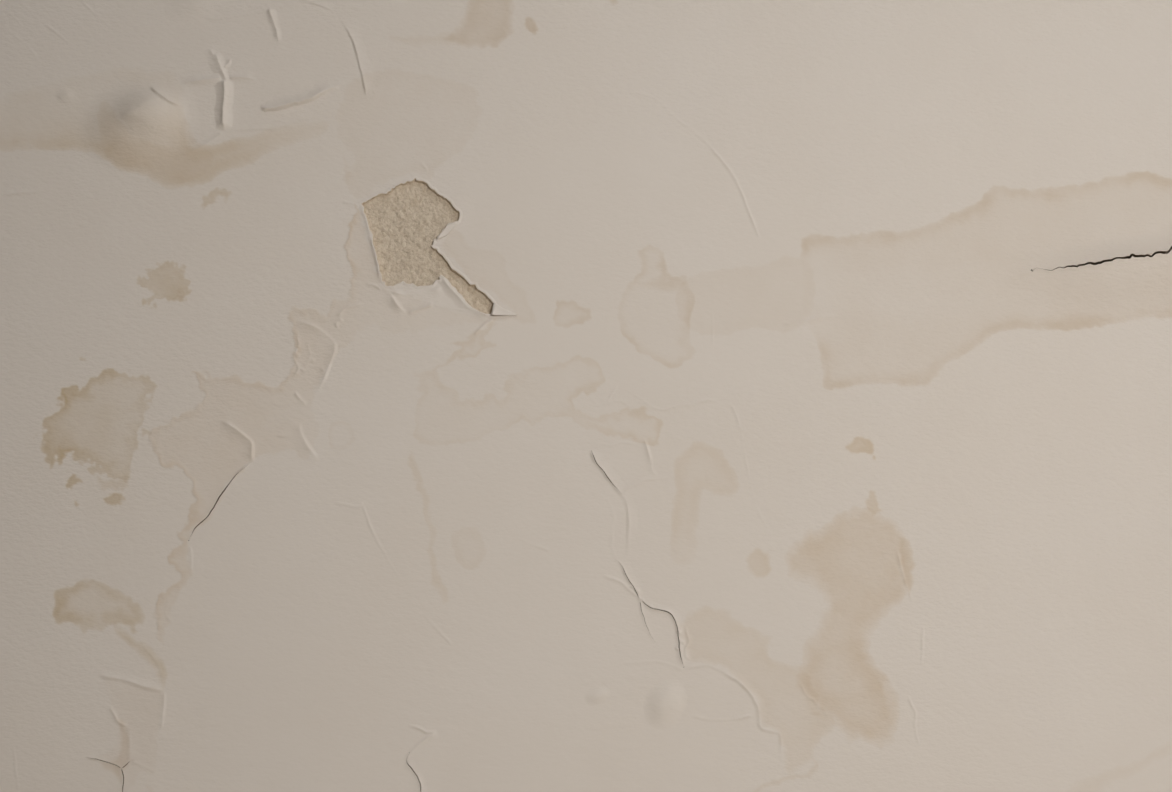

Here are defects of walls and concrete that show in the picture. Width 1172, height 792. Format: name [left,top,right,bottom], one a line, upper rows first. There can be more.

damp [136,120,330,211]
damp [135,260,193,311]
flaking render [358,176,517,317]
damp [616,170,1172,392]
crack [1031,243,1172,273]
damp [33,367,159,507]
crack [187,460,253,541]
crack [589,449,623,495]
damp [51,576,169,689]
crack [614,557,686,667]
damp [673,489,917,792]
crack [83,755,131,792]